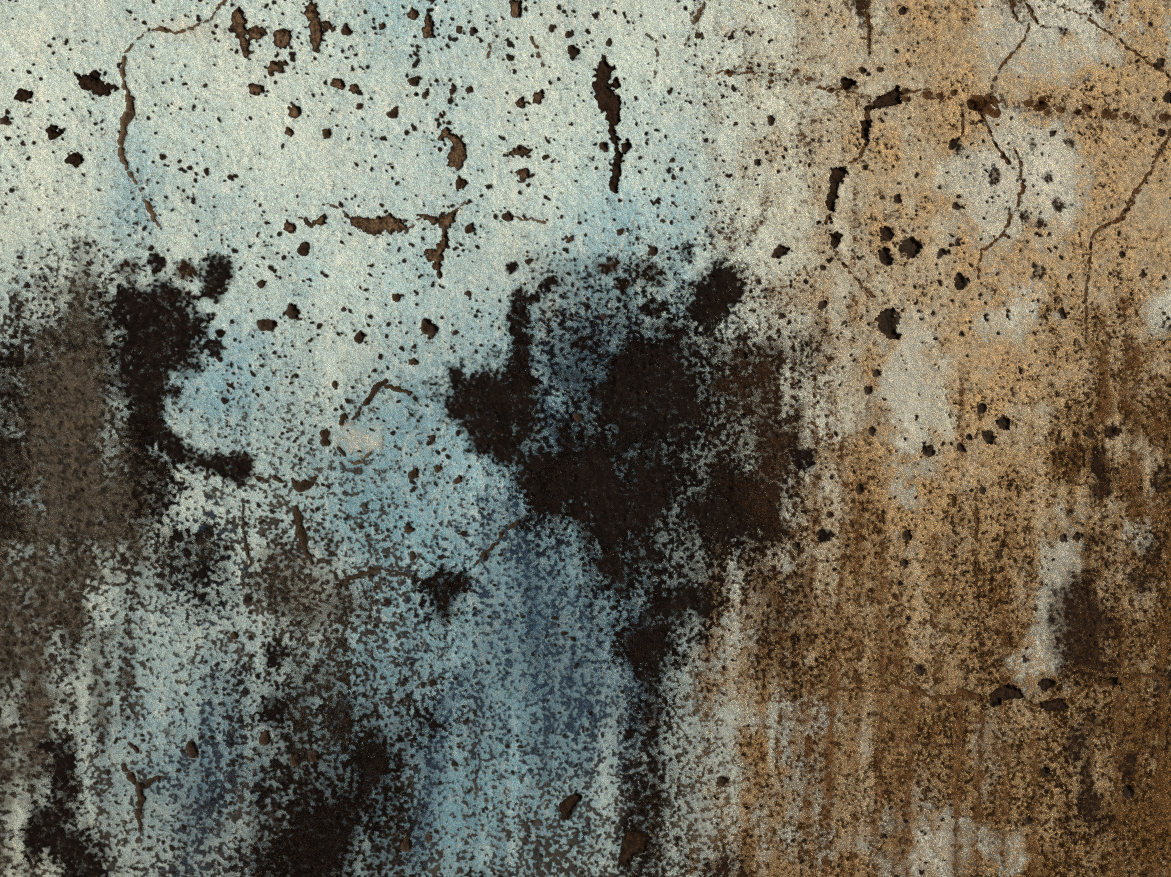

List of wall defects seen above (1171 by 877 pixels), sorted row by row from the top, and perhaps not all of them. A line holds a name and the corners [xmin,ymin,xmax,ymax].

water stain [0,236,835,877]
corrosion [702,0,1171,877]
crack [717,0,1171,340]